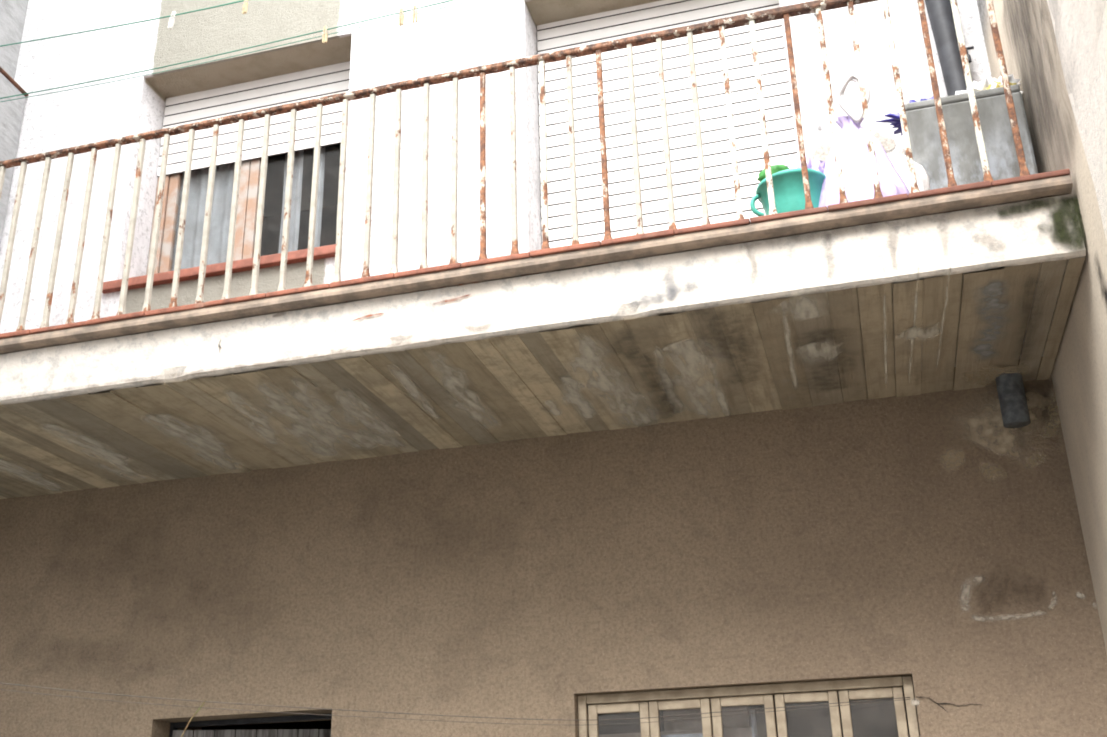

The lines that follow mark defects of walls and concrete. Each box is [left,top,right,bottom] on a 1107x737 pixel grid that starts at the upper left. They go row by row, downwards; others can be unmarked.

flaking render [968,392,1061,479]